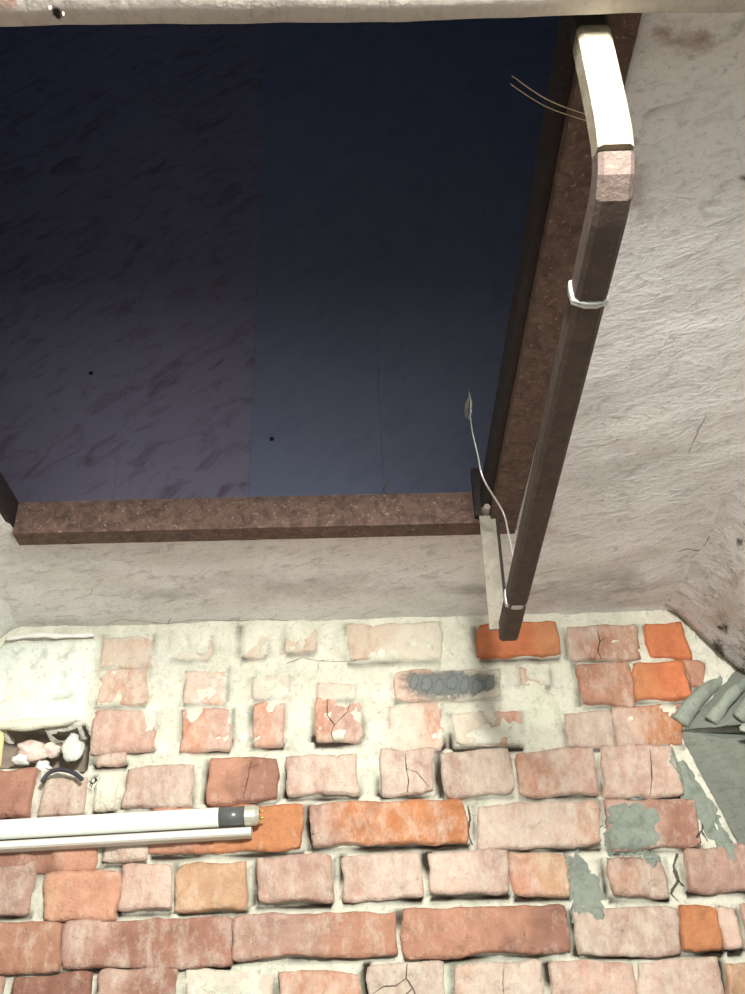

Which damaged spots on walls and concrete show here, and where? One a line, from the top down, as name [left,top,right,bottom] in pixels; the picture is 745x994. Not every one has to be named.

damp [712,624,728,657]
peeling [0,632,100,774]
crack [373,964,416,994]